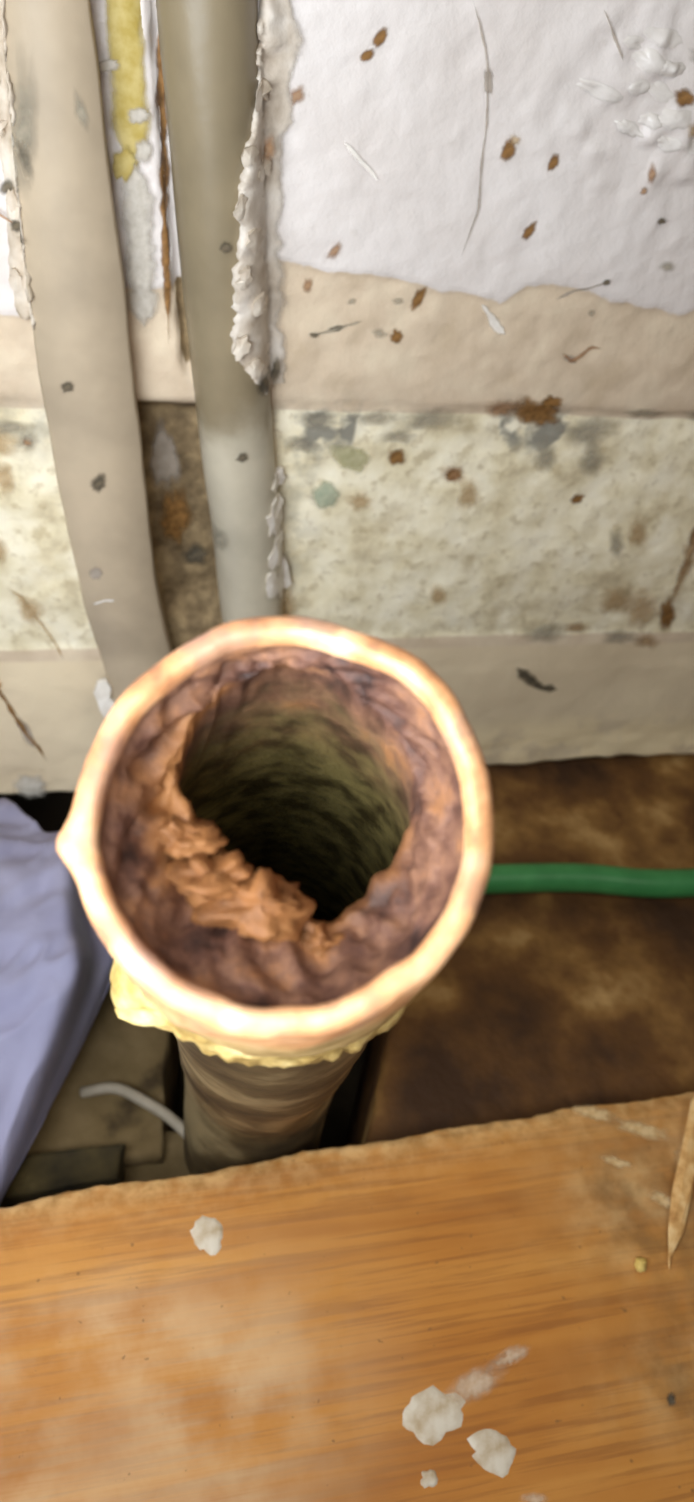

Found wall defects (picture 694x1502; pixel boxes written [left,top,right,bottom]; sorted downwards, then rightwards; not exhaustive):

peeling [0,0,36,329]
flaking render [230,0,302,395]
leakage [0,424,33,451]
leakage [333,447,368,471]
leakage [365,414,444,440]
leakage [574,425,600,468]
leakage [315,483,367,507]
corrosion [607,529,694,645]